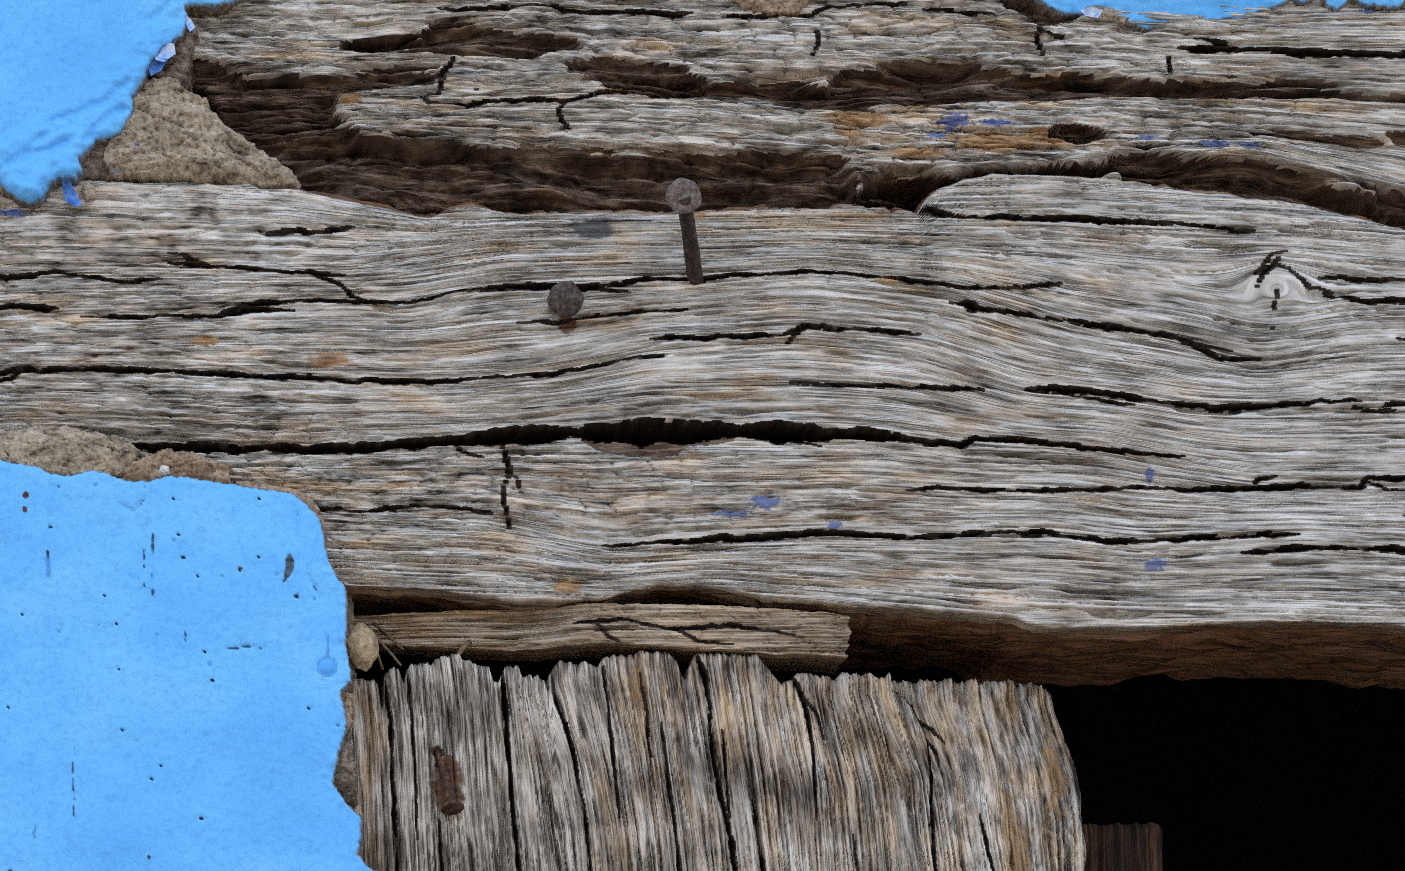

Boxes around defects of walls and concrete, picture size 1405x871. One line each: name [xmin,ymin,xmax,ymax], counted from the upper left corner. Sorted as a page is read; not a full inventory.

spalling [733,0,815,18]
spalling [1080,5,1129,27]
peeling [62,15,301,207]
crack [0,225,1262,386]
crack [1318,274,1405,341]
crack [789,380,985,392]
crack [1024,383,1405,414]
peeling [0,425,327,548]
crack [131,417,1405,555]
spalling [283,554,299,598]
rust [429,755,465,816]